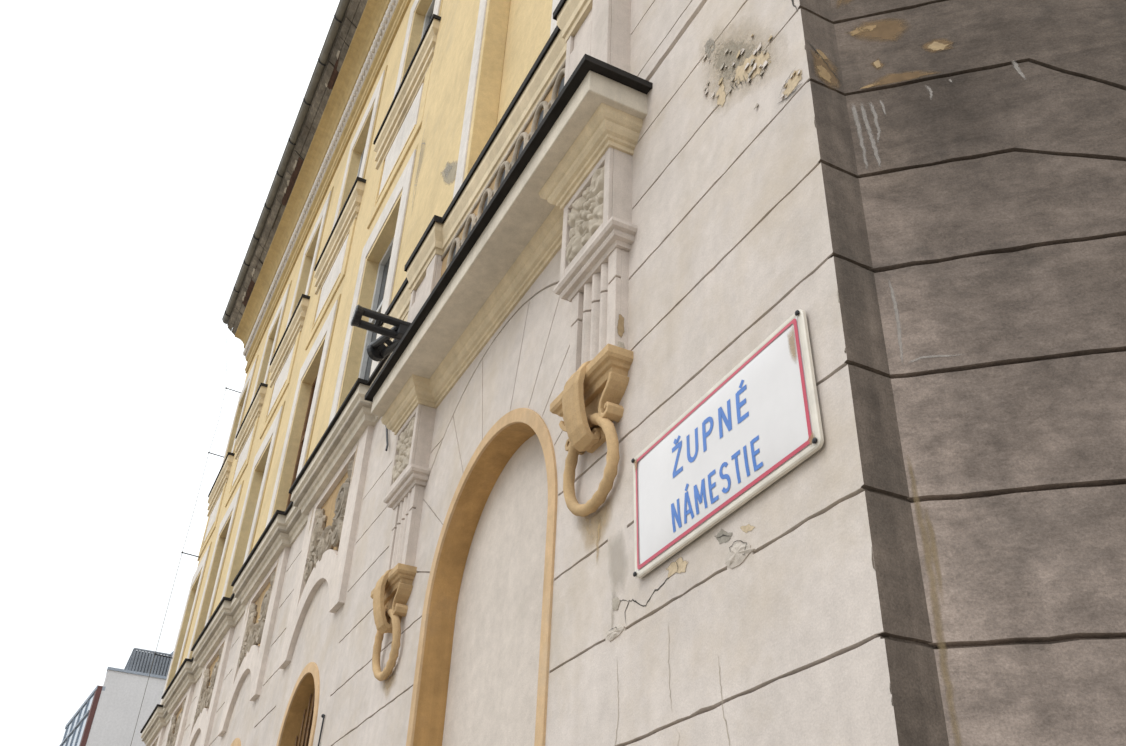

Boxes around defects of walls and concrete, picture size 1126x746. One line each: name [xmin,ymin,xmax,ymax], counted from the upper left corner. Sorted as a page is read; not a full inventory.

flaking render [923,39,952,52]
peeling [703,34,773,107]
flaking render [860,60,934,89]
spalling [716,524,755,544]
spalling [666,557,688,578]
crack [612,578,668,622]
crack [718,657,730,746]